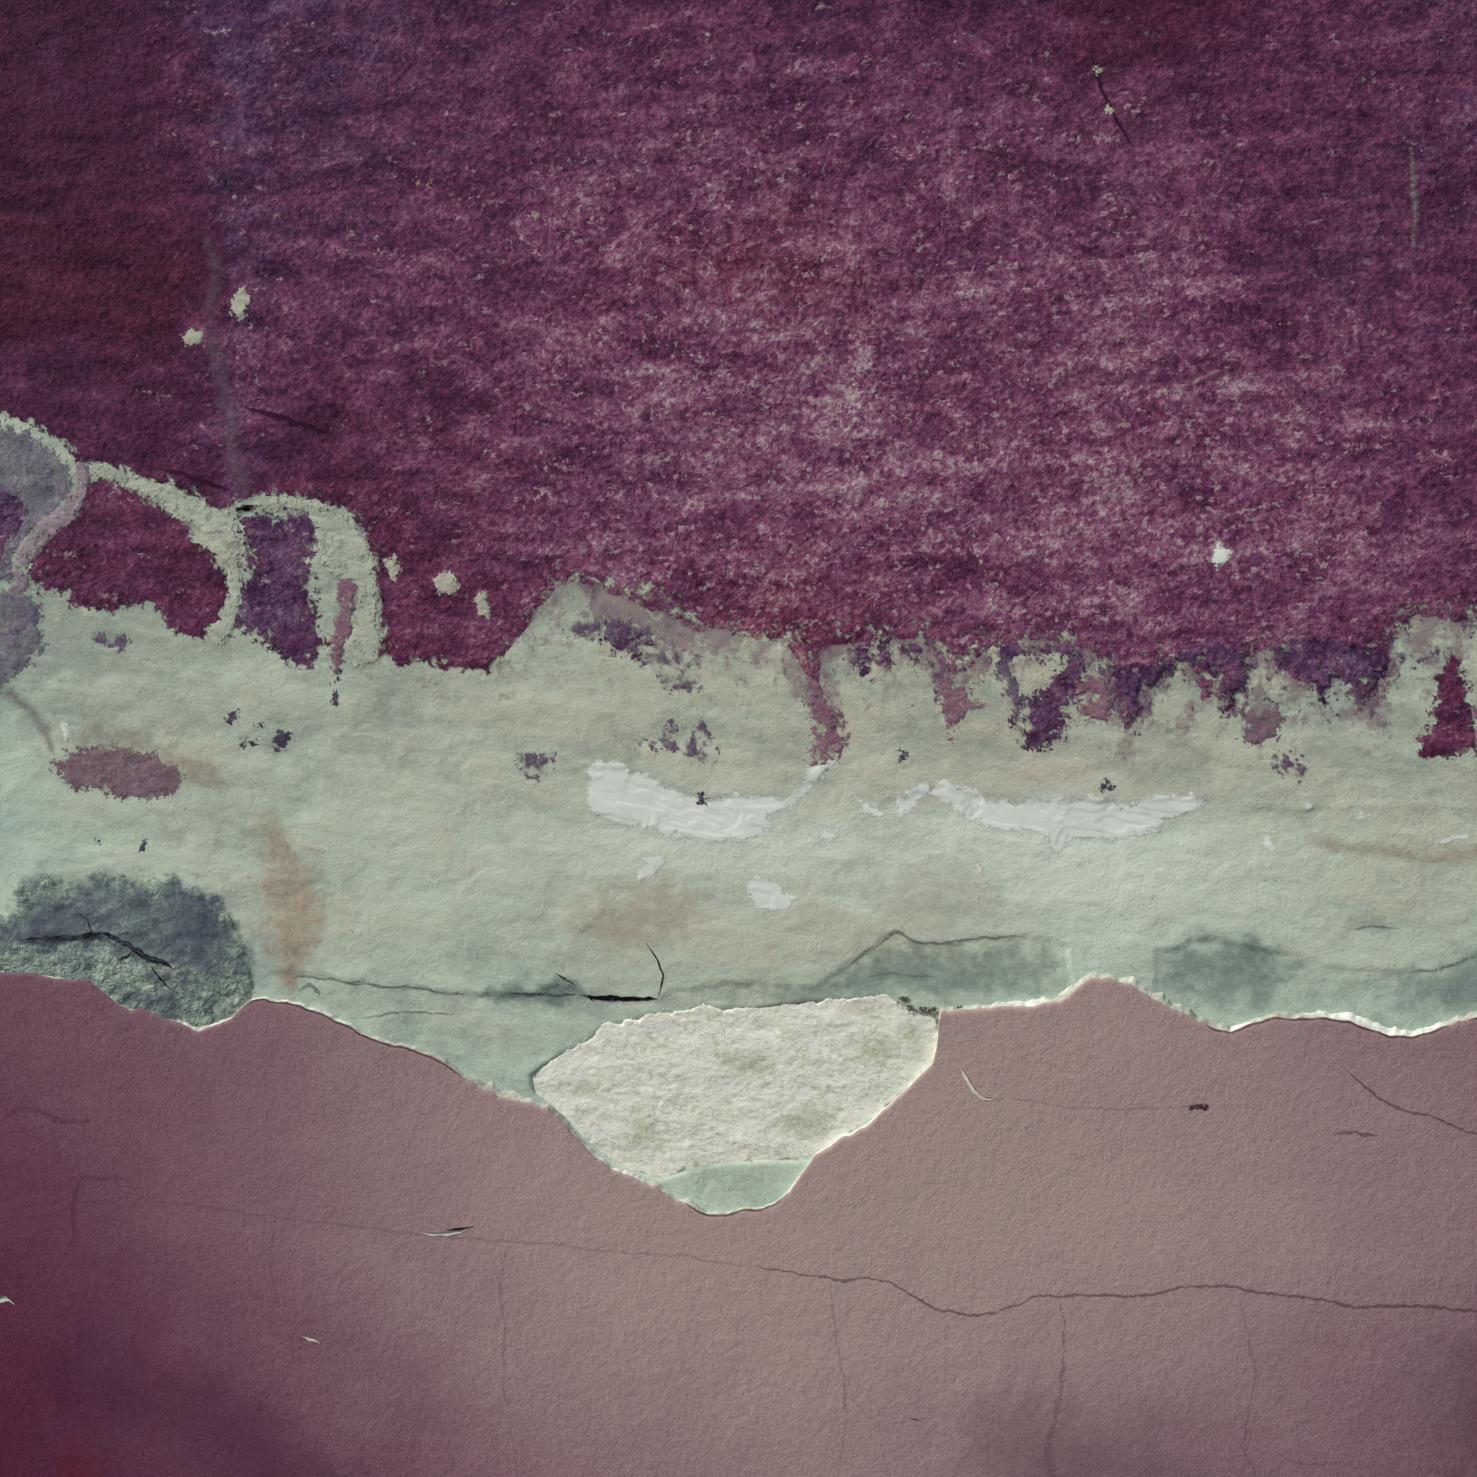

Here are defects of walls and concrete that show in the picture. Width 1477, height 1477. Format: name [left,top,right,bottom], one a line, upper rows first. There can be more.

peeling [0,409,1477,1214]
crack [20,914,177,994]
crack [512,943,664,1002]